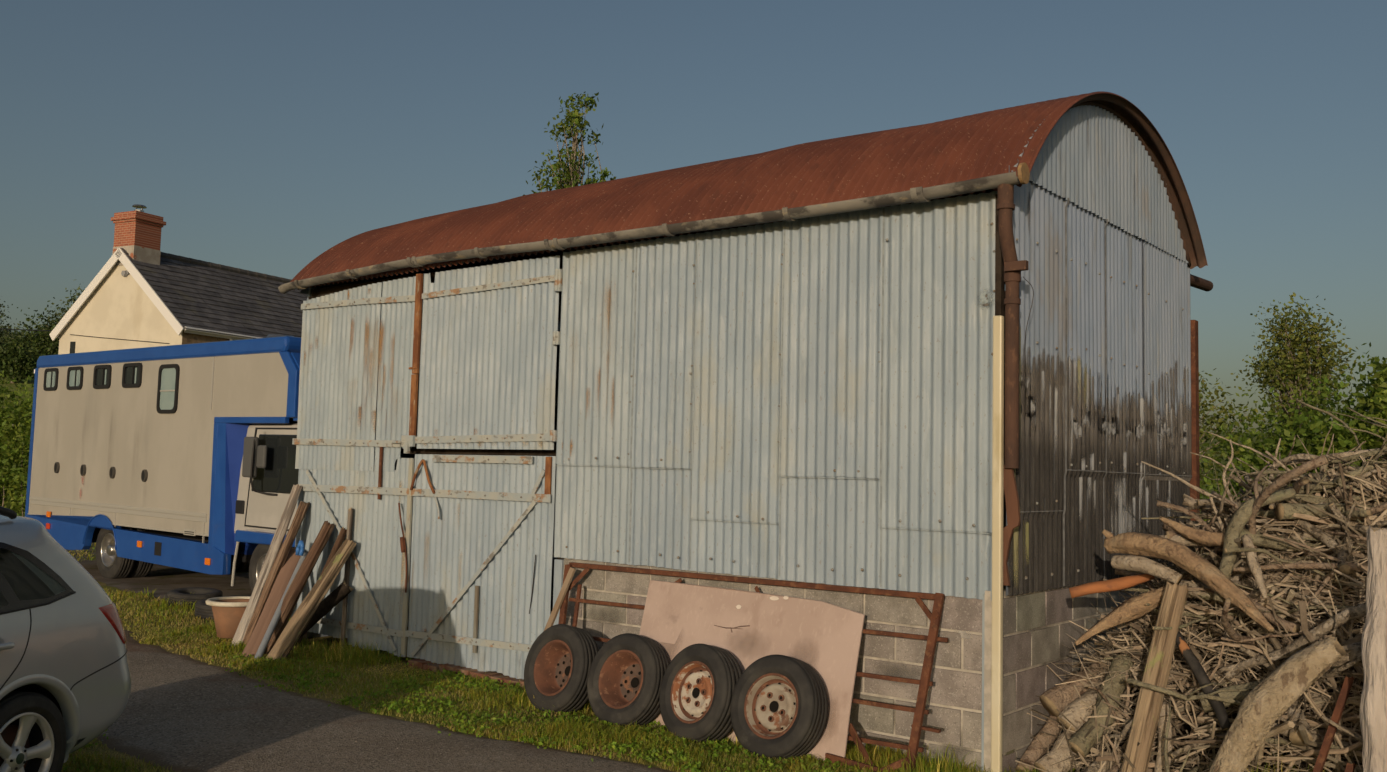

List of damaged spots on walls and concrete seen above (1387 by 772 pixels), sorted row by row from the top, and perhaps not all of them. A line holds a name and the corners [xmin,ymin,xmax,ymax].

leakage [1008,329,1192,596]